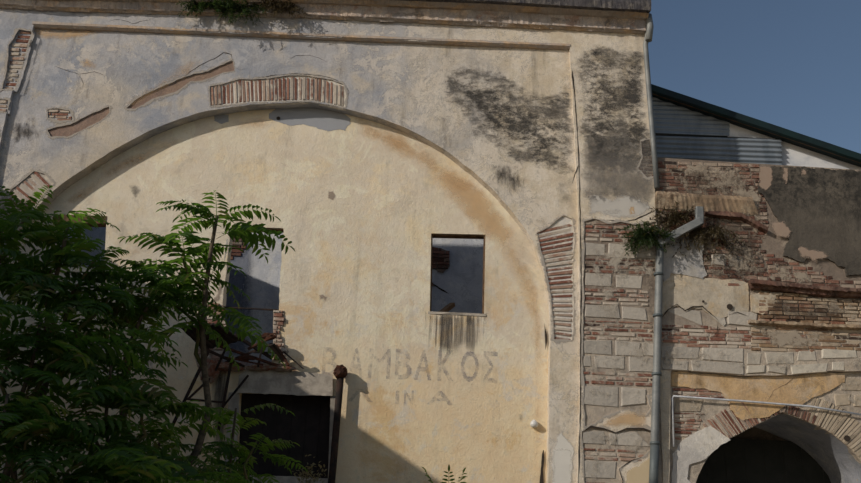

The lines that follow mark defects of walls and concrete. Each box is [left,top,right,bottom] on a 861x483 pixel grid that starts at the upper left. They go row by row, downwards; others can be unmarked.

spalling [0,28,35,115]
flaking render [46,105,112,140]
spalling [124,58,351,131]
leakage [448,69,570,169]
leakage [580,47,651,200]
crack [572,71,650,483]
peeling [772,222,791,237]
peeling [798,247,827,261]
leakage [435,317,474,348]
spalling [537,195,658,483]